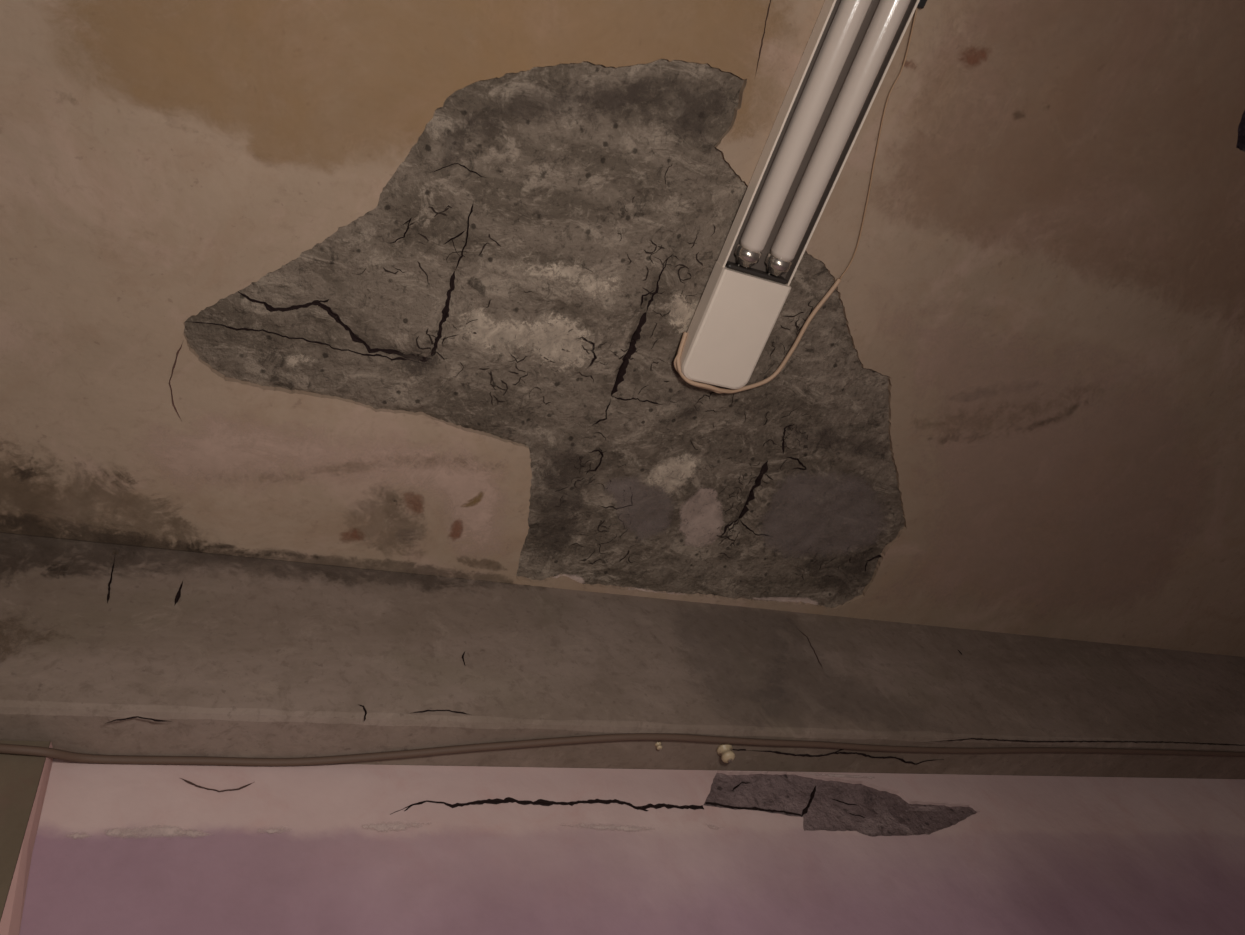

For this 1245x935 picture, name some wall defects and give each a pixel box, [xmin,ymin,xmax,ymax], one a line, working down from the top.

crack [169,163,486,421]
spalling [184,59,905,608]
crack [575,254,673,472]
crack [721,424,807,536]
crack [390,738,1241,818]
spalling [704,772,977,837]